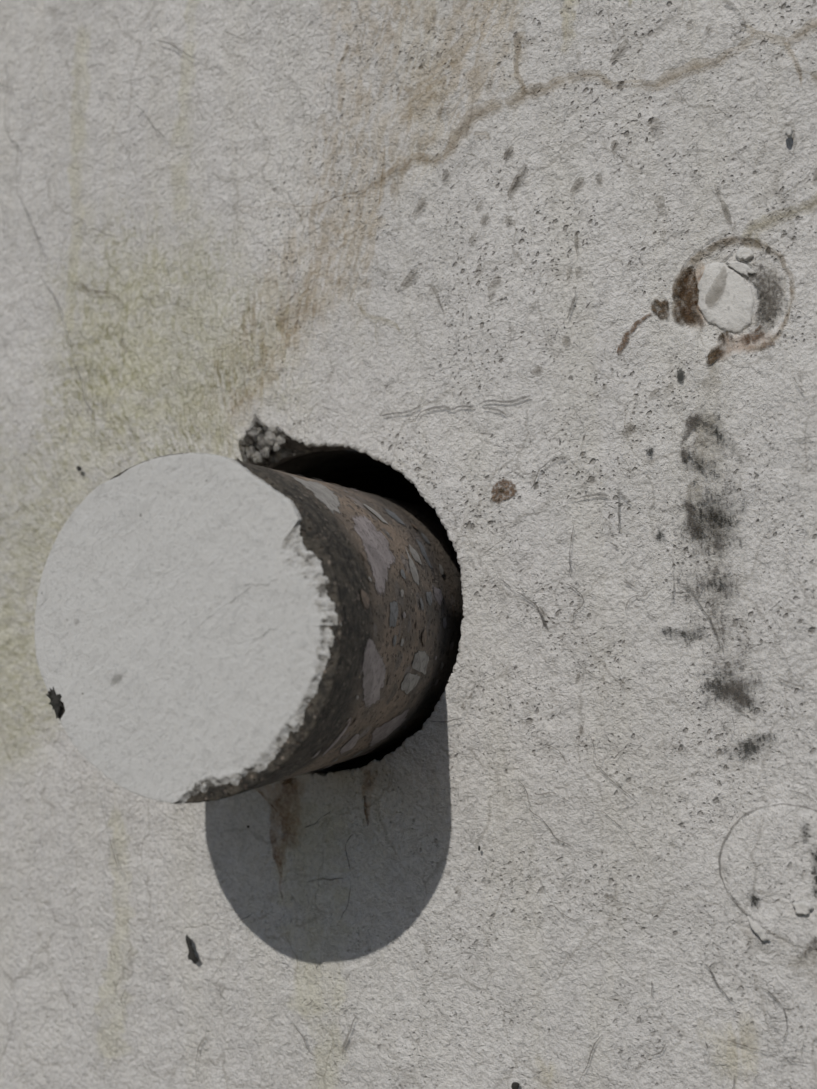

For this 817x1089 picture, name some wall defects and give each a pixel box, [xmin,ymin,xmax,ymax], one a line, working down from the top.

corrosion [617,267,703,353]
corrosion [707,325,775,365]
spalling [236,414,341,467]